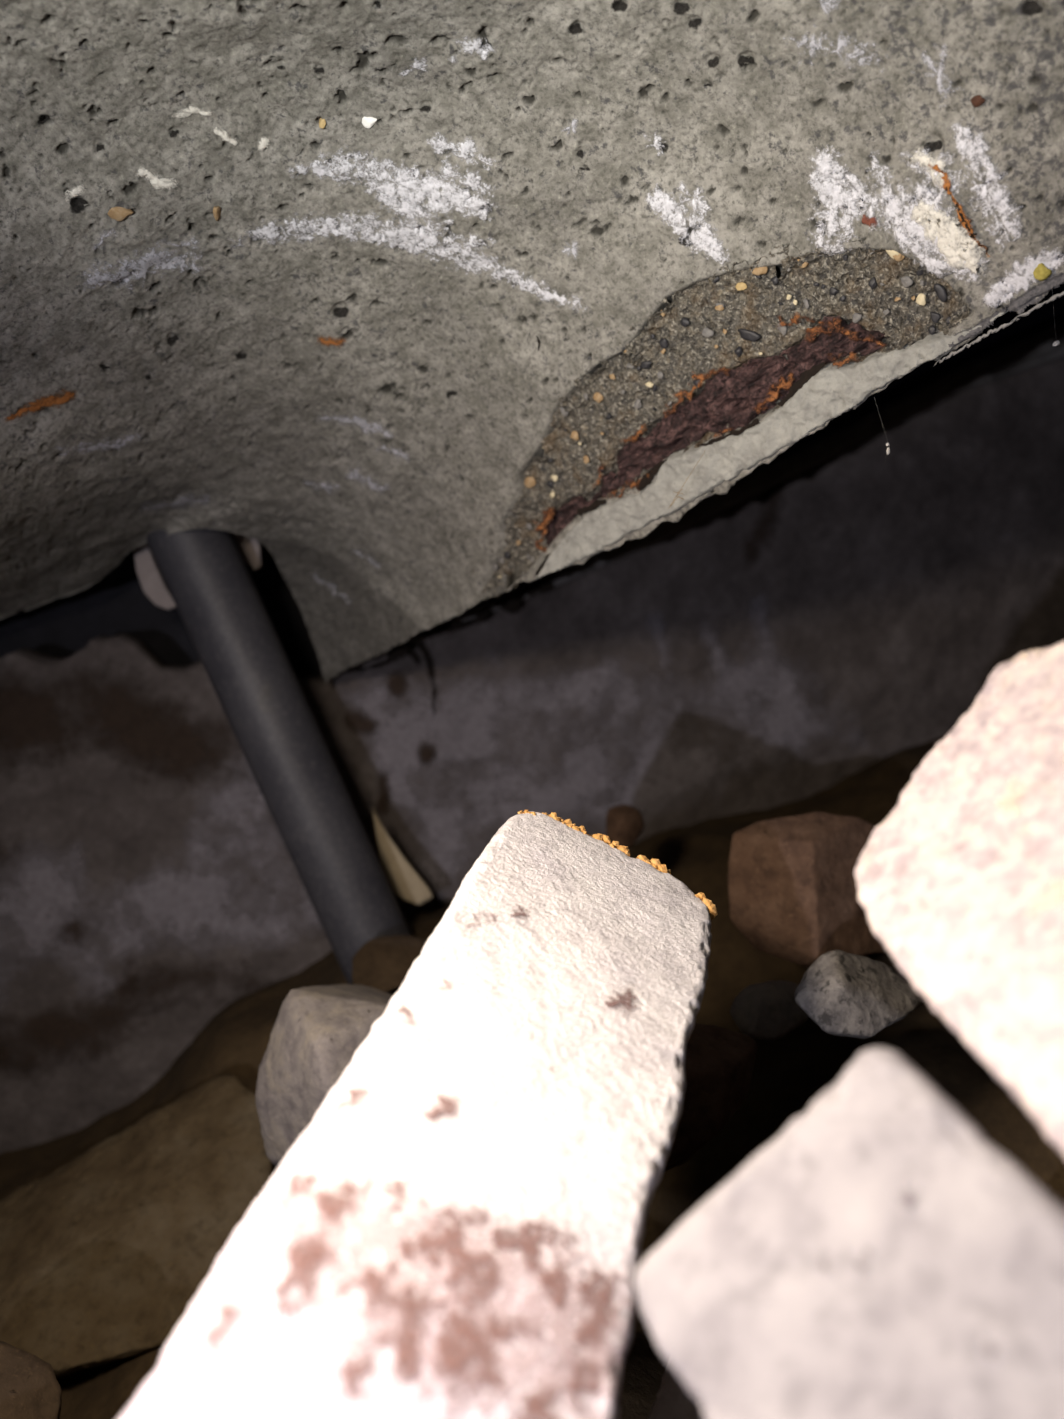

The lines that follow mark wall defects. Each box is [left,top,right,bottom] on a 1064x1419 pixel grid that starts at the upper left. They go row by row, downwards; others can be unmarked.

efflorescence [810,124,1064,308]
spalling [472,238,1064,597]